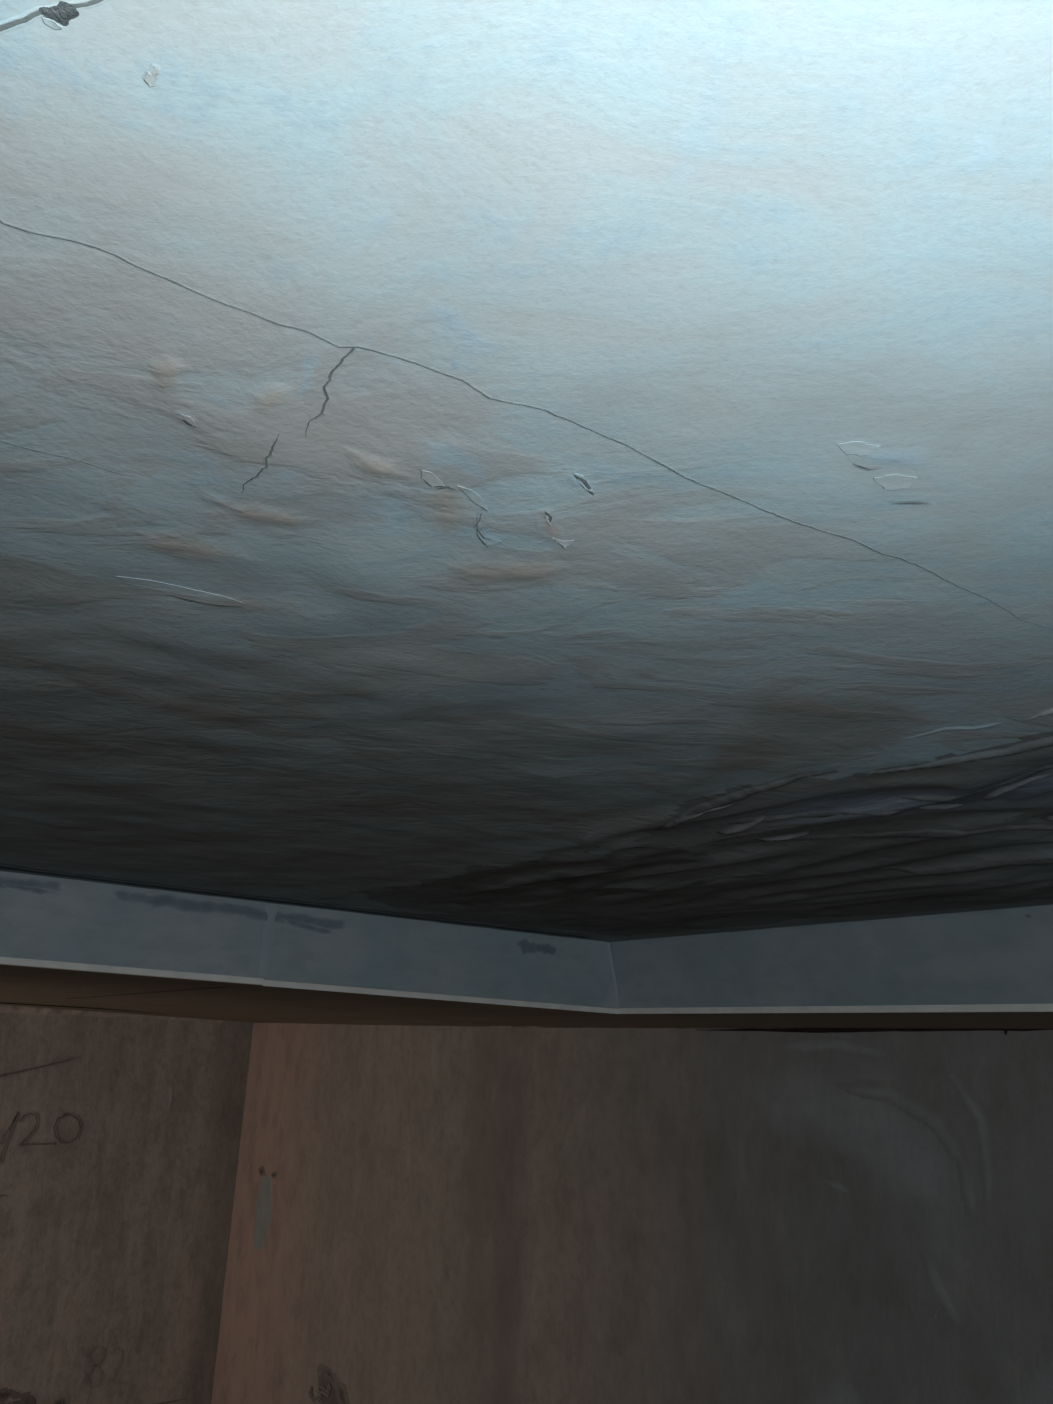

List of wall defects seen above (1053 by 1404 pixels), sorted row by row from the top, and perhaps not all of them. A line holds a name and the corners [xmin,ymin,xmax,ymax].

crack [0,0,109,35]
crack [0,218,1053,630]
leakage [41,635,437,738]
leakage [105,680,1053,957]
leakage [0,873,70,898]